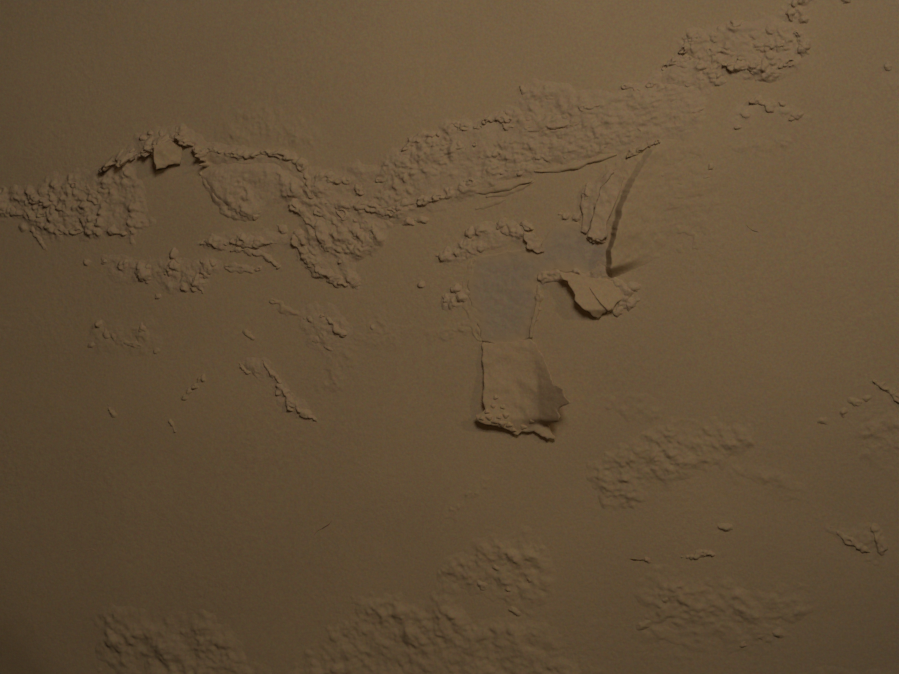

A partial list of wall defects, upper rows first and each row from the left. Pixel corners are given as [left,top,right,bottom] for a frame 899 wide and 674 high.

flaking render [0,123,315,251]
flaking render [436,217,545,266]
peeling [537,263,642,318]
peeling [475,338,571,439]